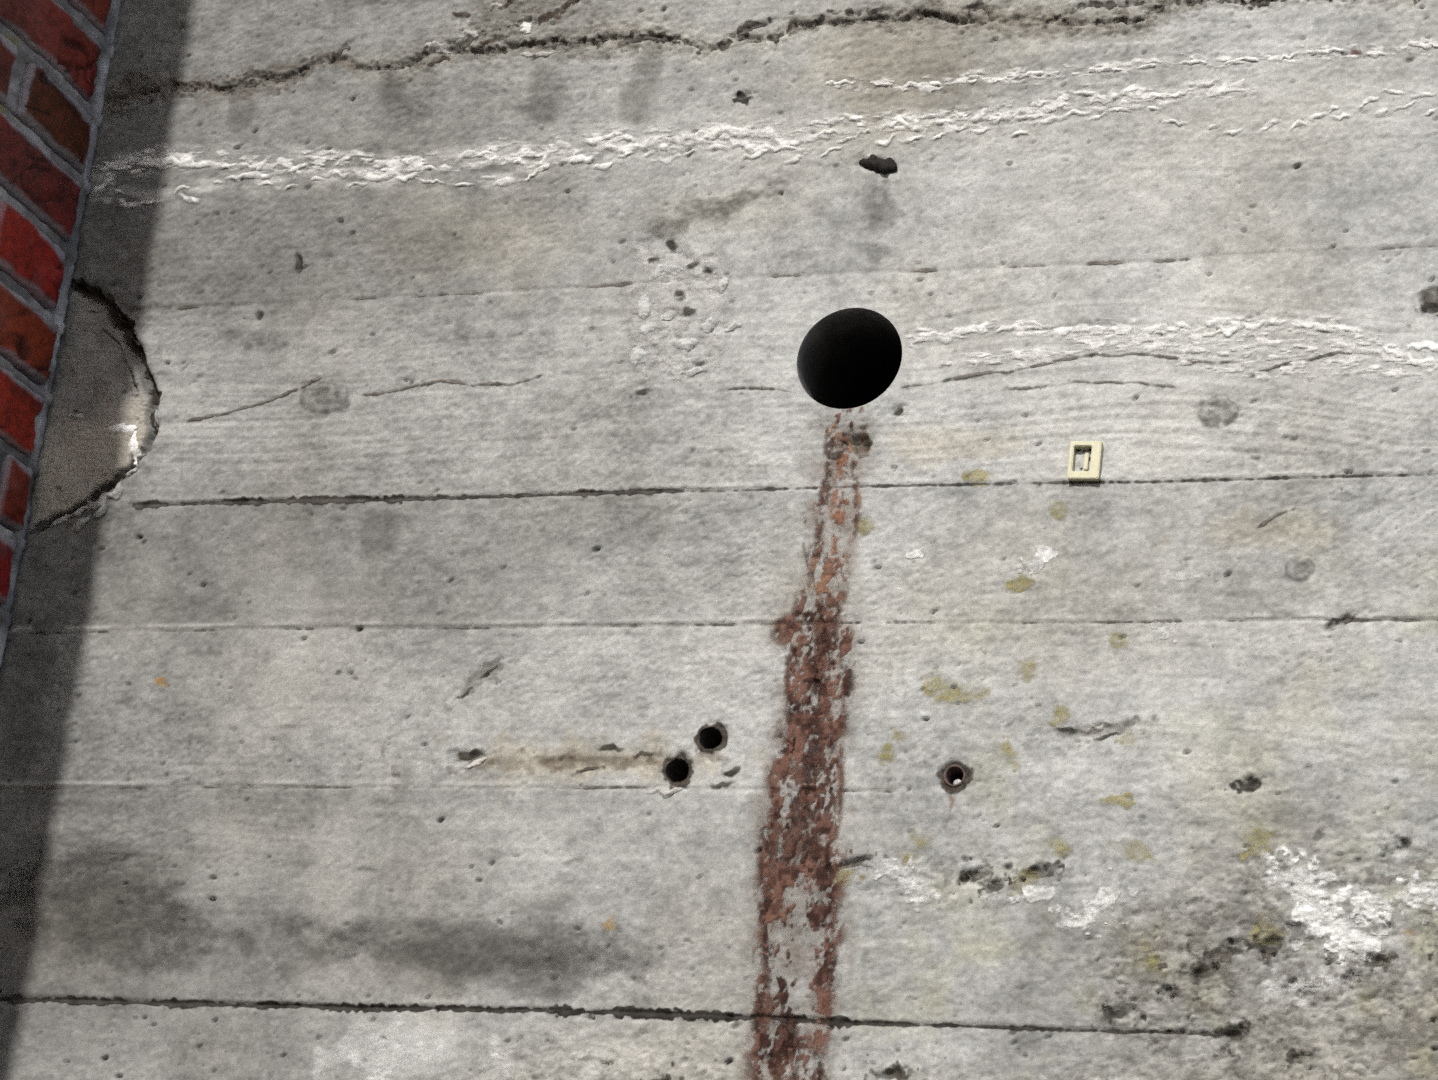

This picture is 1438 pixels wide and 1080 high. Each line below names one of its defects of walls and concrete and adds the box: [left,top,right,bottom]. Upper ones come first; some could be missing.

crack [112,0,1285,103]
efflorescence [90,37,1438,207]
spalling [26,278,162,536]
efflorescence [907,316,1438,378]
rust [747,407,863,1080]
efflorescence [1264,846,1438,971]